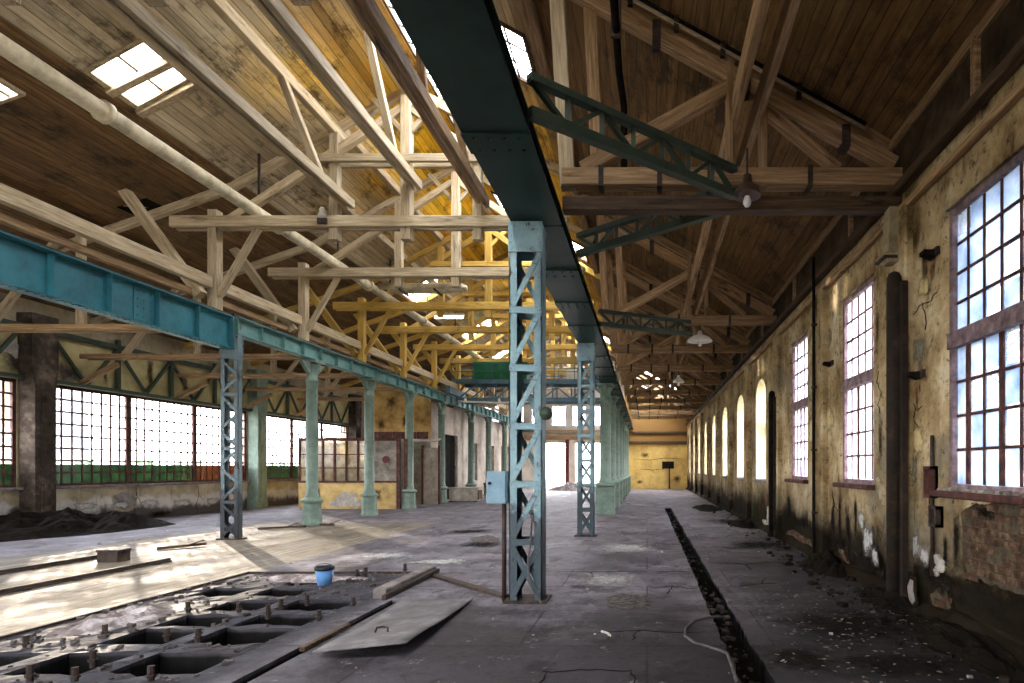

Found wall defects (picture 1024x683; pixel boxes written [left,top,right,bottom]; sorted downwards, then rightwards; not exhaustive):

crack [913,292,937,330]
flaking render [329,492,362,508]
damp [827,501,885,579]
damp [913,517,1017,624]
damp [978,507,993,519]
flaking render [959,501,1024,599]